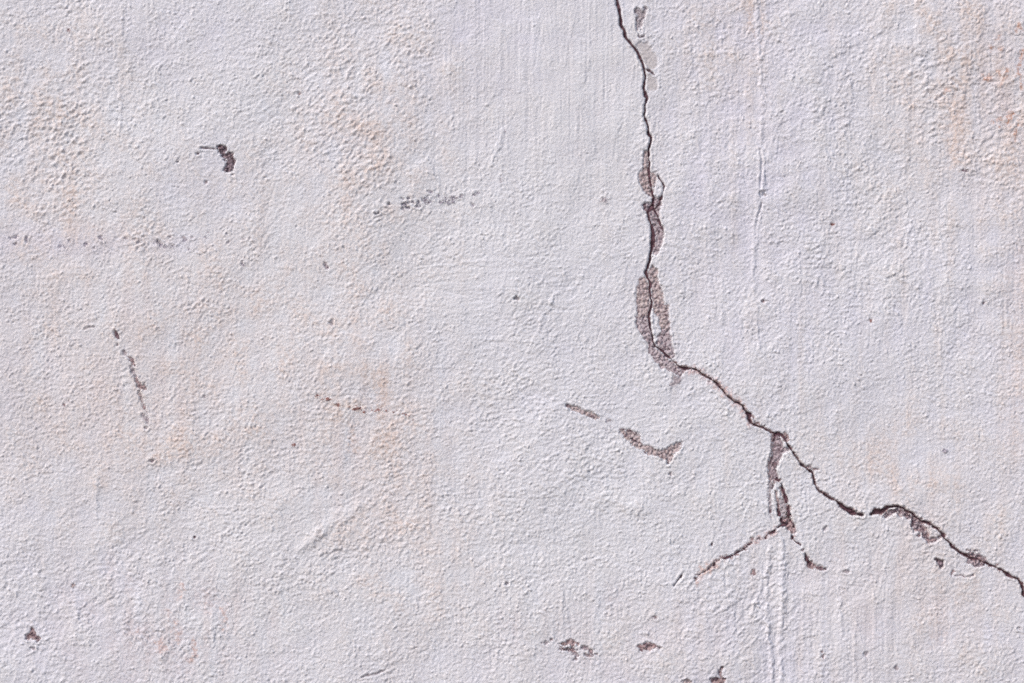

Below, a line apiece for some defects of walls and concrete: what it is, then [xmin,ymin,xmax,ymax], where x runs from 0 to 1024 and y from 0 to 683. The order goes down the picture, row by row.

spalling [197,145,236,175]
crack [616,0,1024,597]
peeling [566,404,682,476]